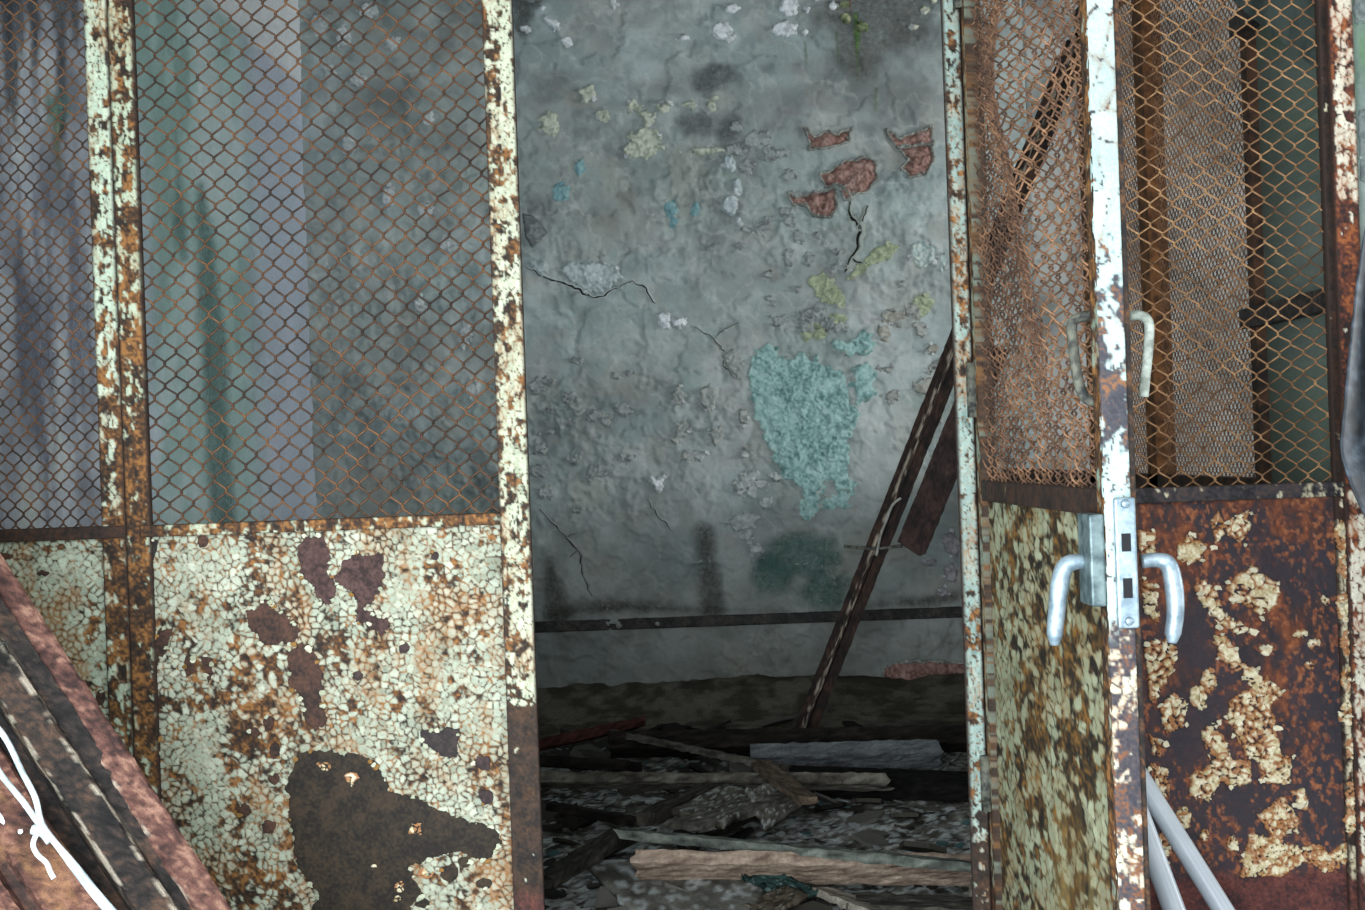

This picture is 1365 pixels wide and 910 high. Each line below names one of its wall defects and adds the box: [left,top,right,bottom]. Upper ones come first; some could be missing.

peeling [769,0,839,37]
peeling [578,84,880,284]
spalling [885,124,936,179]
crack [844,200,869,273]
crack [525,265,656,304]
crack [695,322,740,378]
peeling [764,295,940,406]
corrosion [296,533,390,636]
corrosion [182,654,214,683]
corrosion [245,596,327,734]
peeling [316,762,359,785]
corrosion [236,714,502,910]